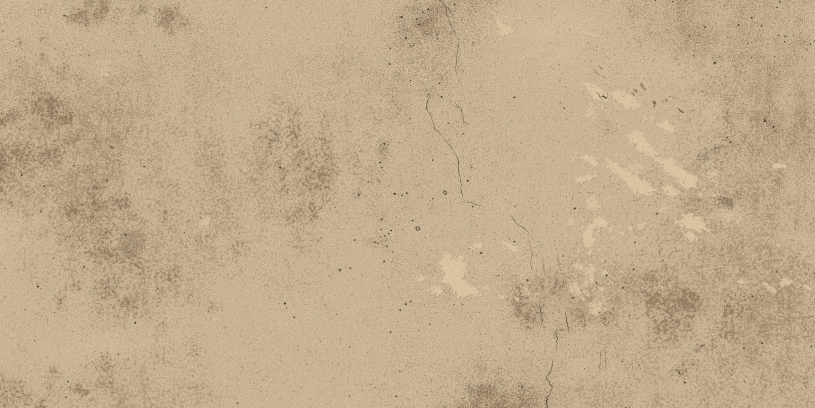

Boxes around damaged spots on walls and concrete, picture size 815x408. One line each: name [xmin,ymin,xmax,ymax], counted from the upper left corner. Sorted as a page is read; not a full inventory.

crack [426,99,482,206]
peeling [570,81,721,246]
peeling [415,254,482,298]
peeling [563,194,647,315]
crack [539,289,569,408]